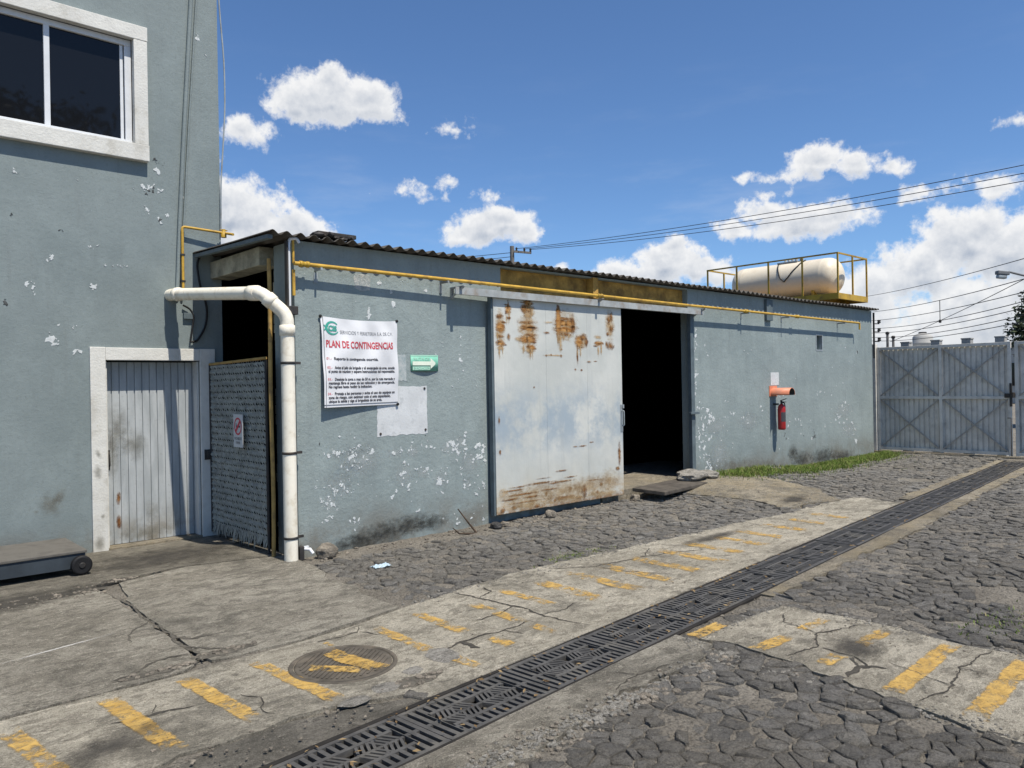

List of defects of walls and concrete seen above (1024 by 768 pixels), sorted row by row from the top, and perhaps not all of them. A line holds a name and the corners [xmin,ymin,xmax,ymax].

peeling [140,158,169,224]
rust [496,300,614,371]
peeling [694,329,857,470]
peeling [315,436,375,524]
peeling [390,432,487,525]
rust [501,448,621,513]
water stain [342,519,436,547]
crack [97,555,270,682]
crack [426,587,589,658]
crack [782,614,992,701]